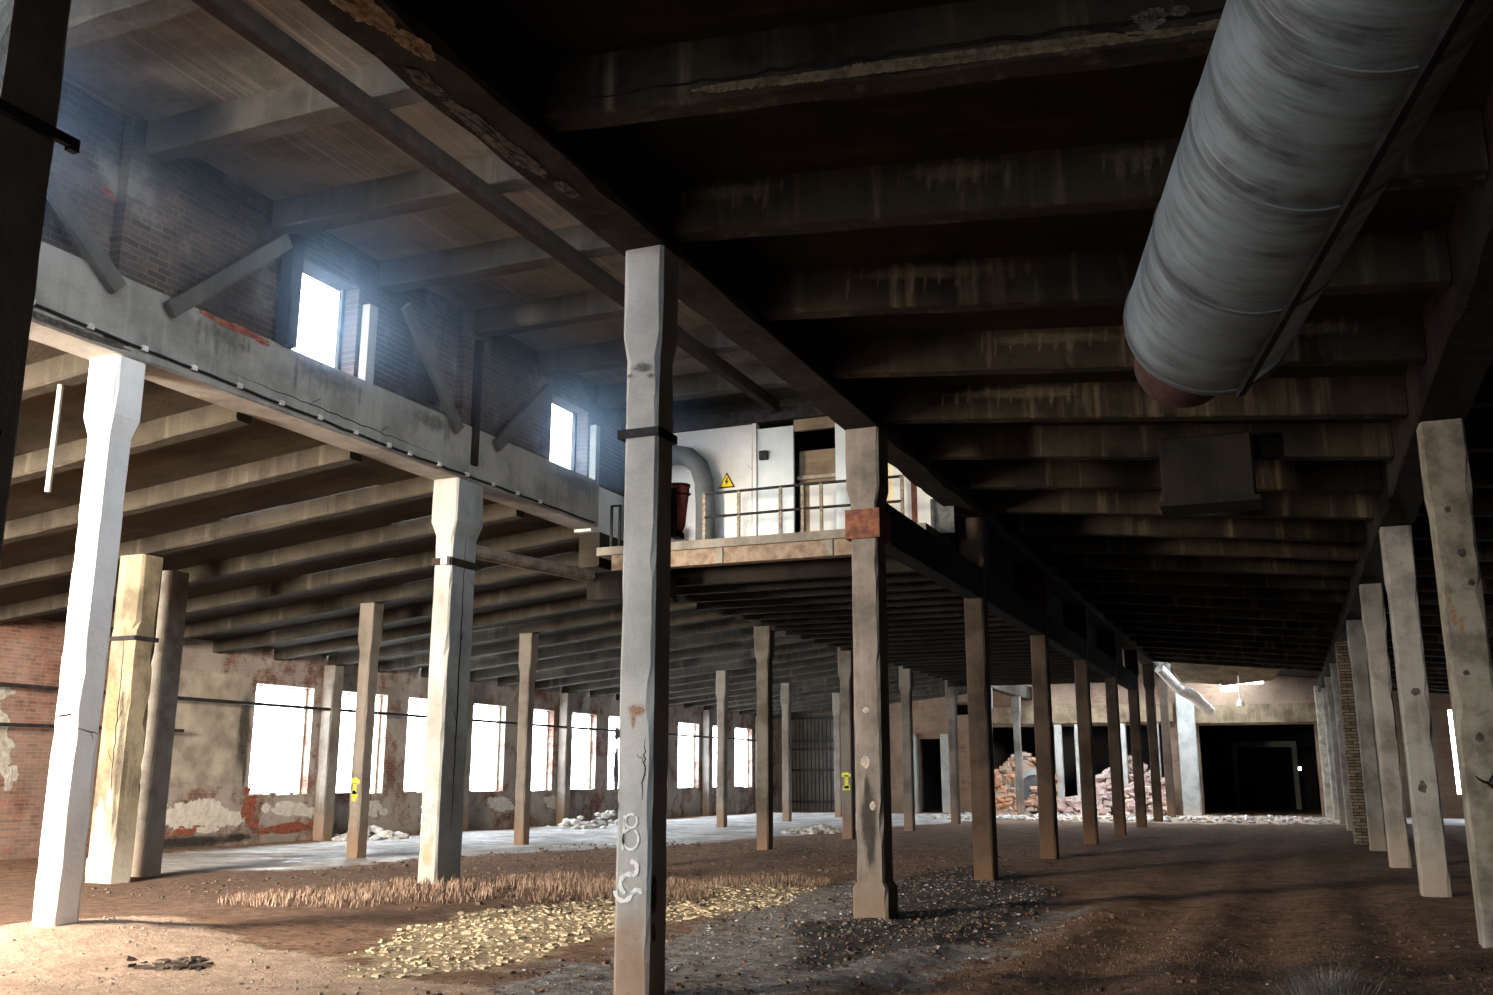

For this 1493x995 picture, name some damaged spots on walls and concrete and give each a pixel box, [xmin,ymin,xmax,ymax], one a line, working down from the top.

peeling [0,686,19,792]
peeling [165,787,315,836]